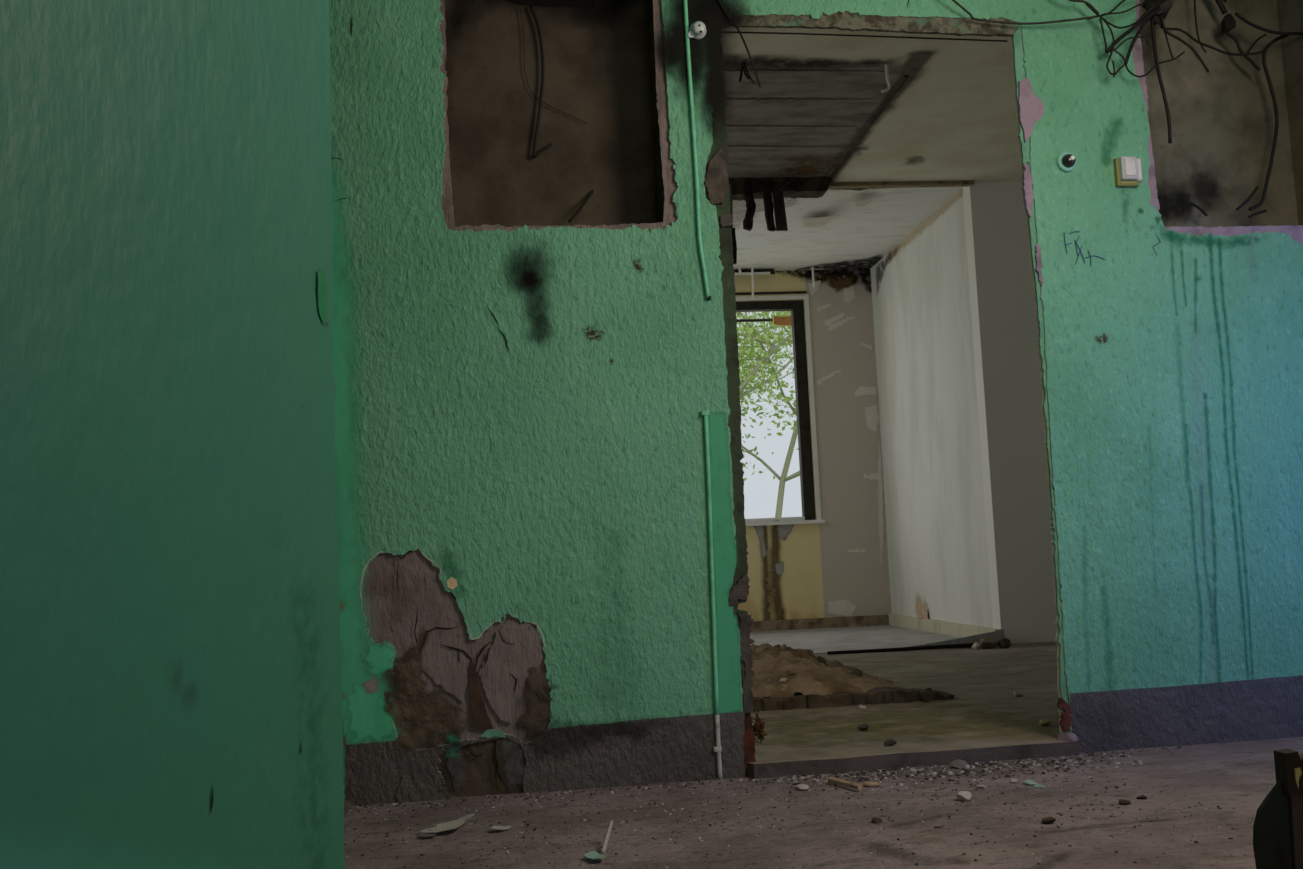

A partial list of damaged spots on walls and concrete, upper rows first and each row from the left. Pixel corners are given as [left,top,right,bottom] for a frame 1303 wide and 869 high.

flaking render [1021,162,1034,218]
flaking render [1017,77,1045,143]
damp [1139,209,1253,683]
flaking render [346,549,553,798]